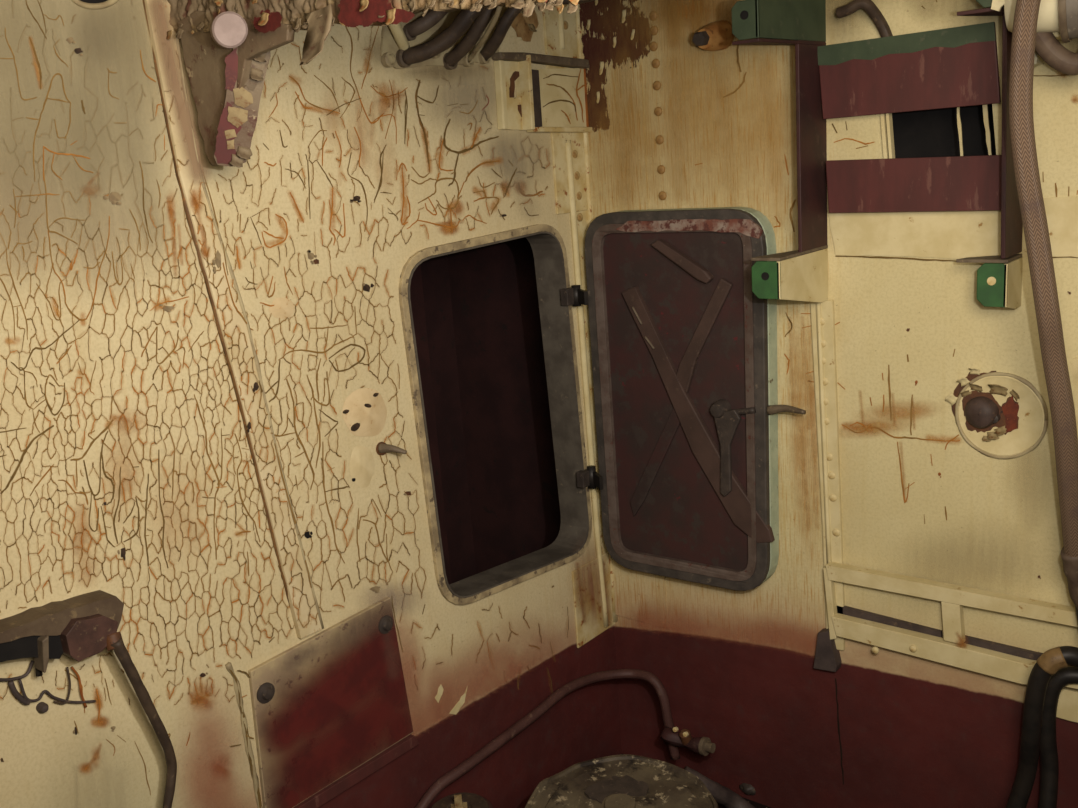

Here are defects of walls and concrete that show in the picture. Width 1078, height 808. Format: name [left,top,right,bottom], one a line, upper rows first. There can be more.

crack [204,26,543,330]
peeling [251,0,497,65]
crack [543,69,585,124]
crack [0,0,175,568]
crack [141,296,204,367]
crack [194,394,260,576]
crack [259,306,393,588]
peeling [945,368,996,417]